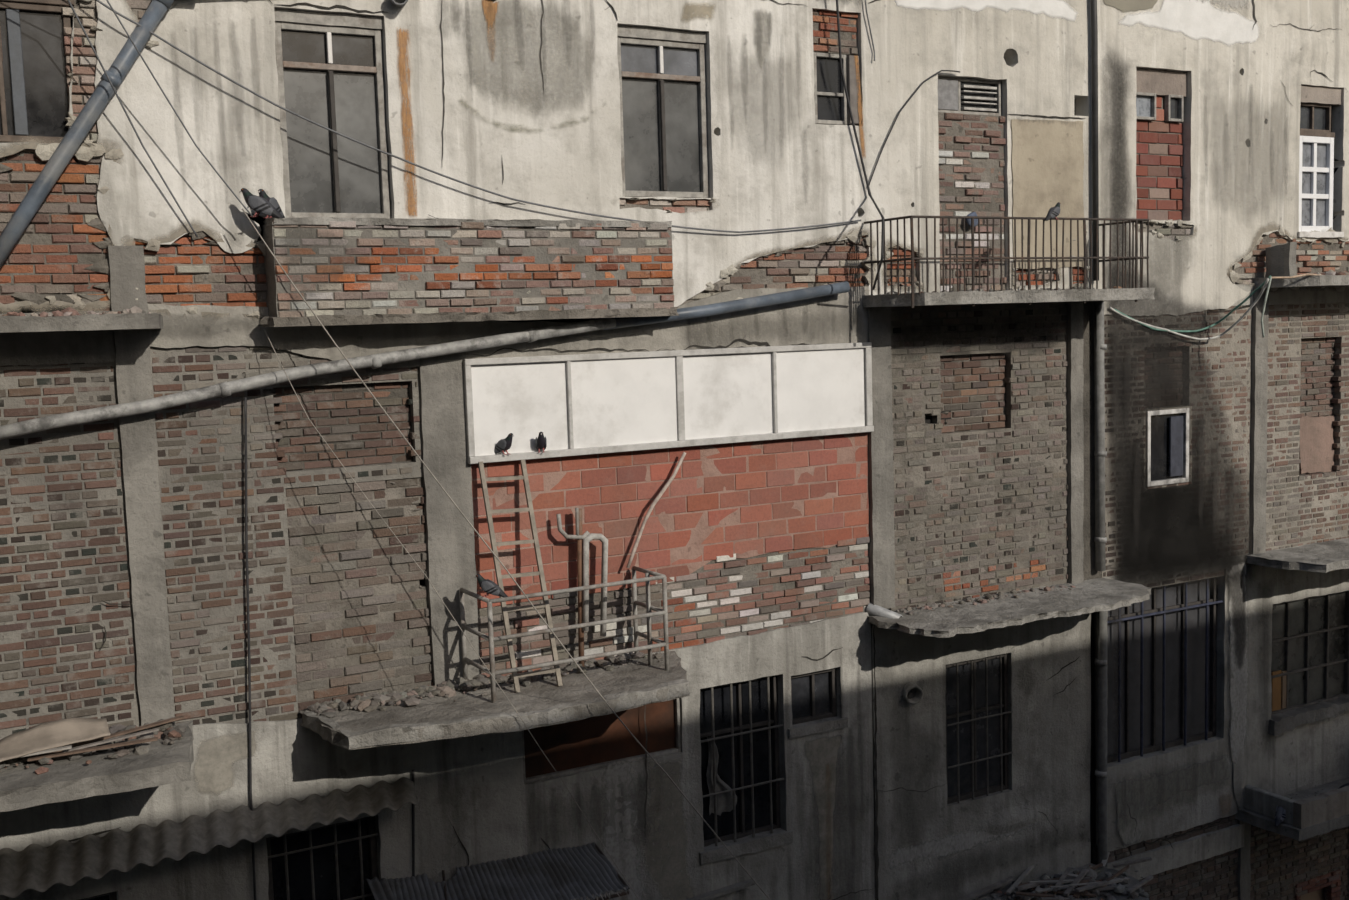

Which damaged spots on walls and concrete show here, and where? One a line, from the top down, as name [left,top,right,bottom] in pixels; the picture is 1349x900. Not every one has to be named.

flaking render [62,0,102,127]
corrosion [397,29,417,216]
crack [438,8,446,160]
crack [1252,0,1337,31]
flaking render [0,120,267,319]
flaking render [679,229,924,306]
flaking render [1227,225,1349,292]